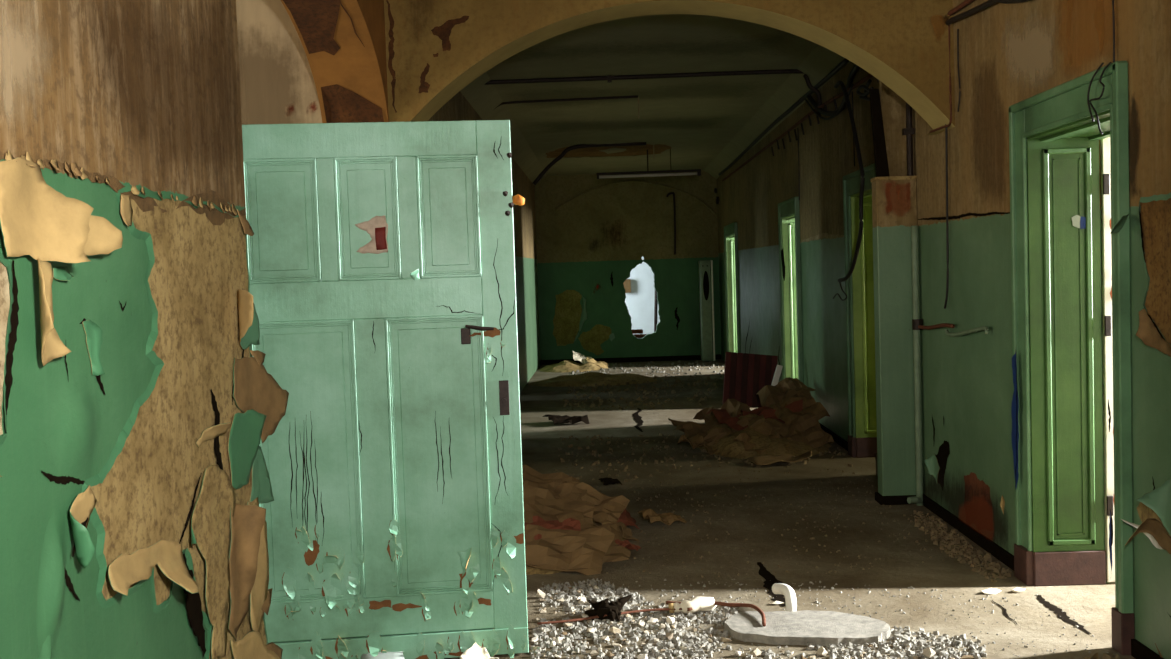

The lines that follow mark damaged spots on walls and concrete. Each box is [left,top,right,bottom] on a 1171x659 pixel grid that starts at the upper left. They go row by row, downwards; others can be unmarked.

spalling [419,16,469,93]
spalling [321,84,384,123]
flaking render [1110,192,1171,357]
flaking render [0,150,364,659]
peeling [925,416,950,484]
peeling [315,632,387,659]